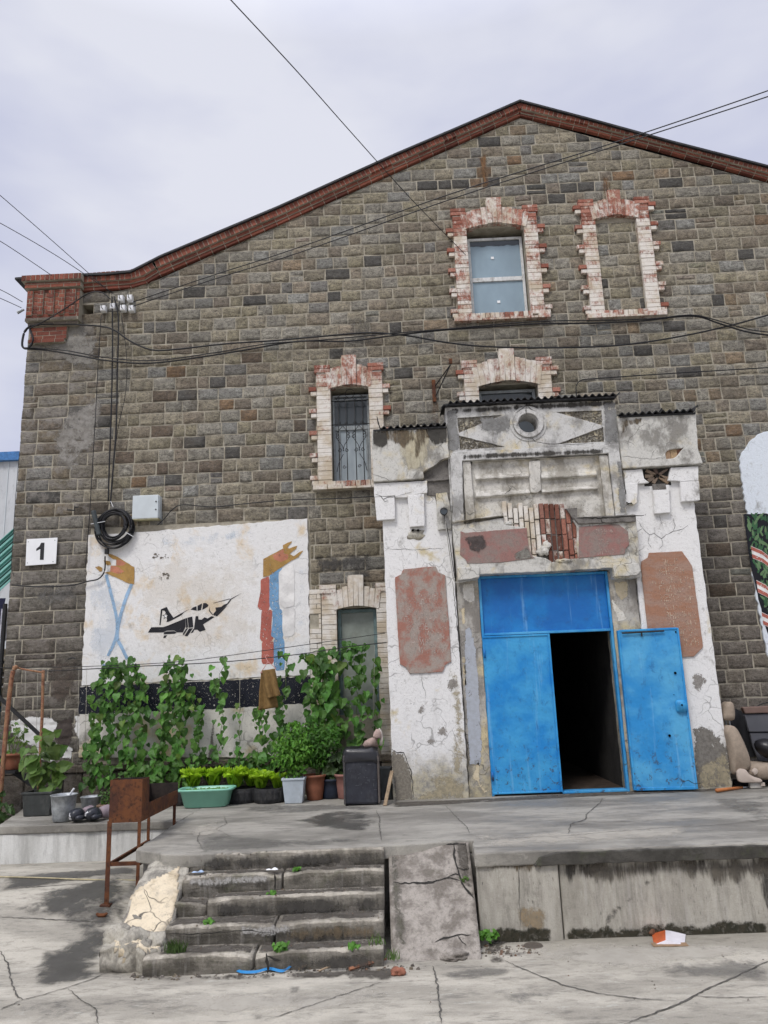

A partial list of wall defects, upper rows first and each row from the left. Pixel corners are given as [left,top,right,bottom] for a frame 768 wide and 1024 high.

water stain [401,431,428,469]
crack [583,451,687,548]
flaking render [502,501,578,572]
spalling [391,750,414,800]
peeling [693,727,731,788]
crack [397,800,759,900]
peeling [102,866,180,964]
crack [435,934,468,946]
crack [1,951,107,1024]
crack [507,961,768,1024]